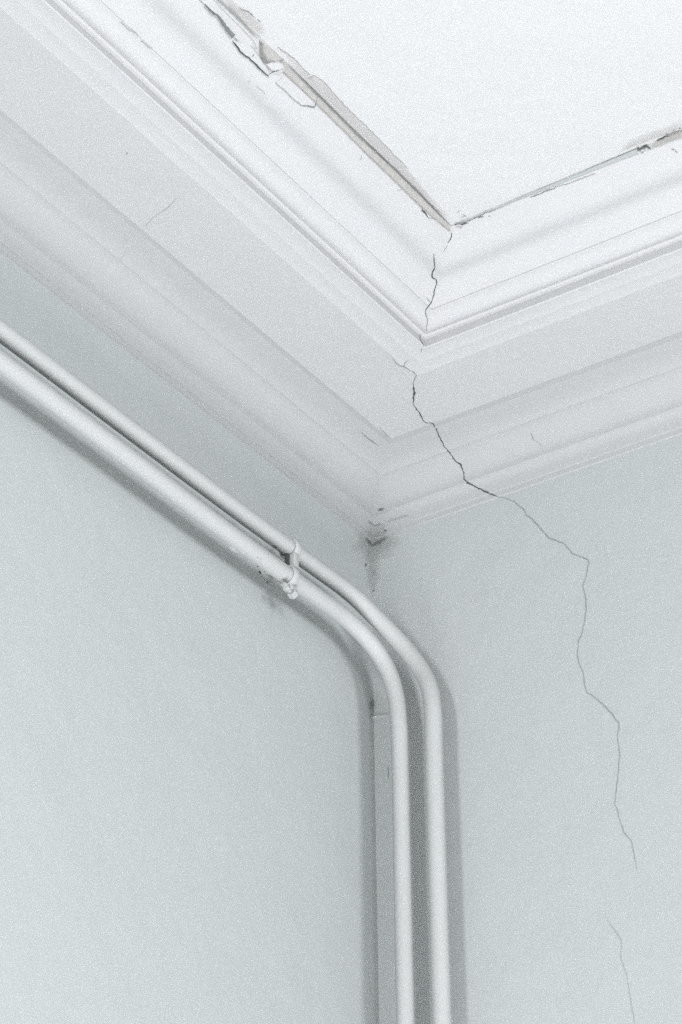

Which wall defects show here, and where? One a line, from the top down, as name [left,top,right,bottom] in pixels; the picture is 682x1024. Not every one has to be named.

flaking render [199,0,450,231]
crack [393,150,638,868]